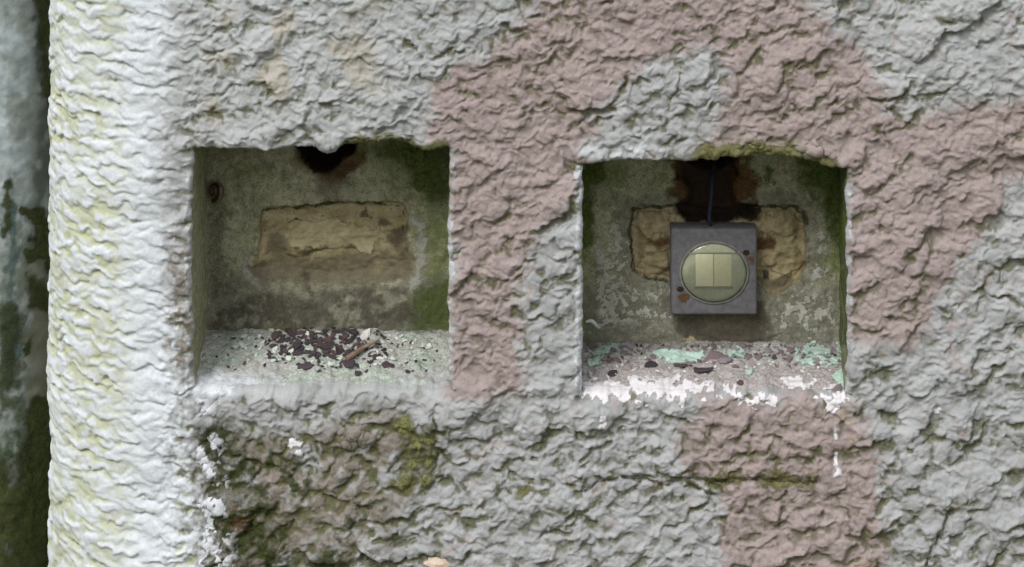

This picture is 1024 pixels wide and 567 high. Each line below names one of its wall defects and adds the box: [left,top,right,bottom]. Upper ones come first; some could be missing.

damp [0,179,49,415]
spalling [241,201,428,292]
rust [667,155,762,222]
spalling [579,205,850,414]
damp [25,395,51,567]